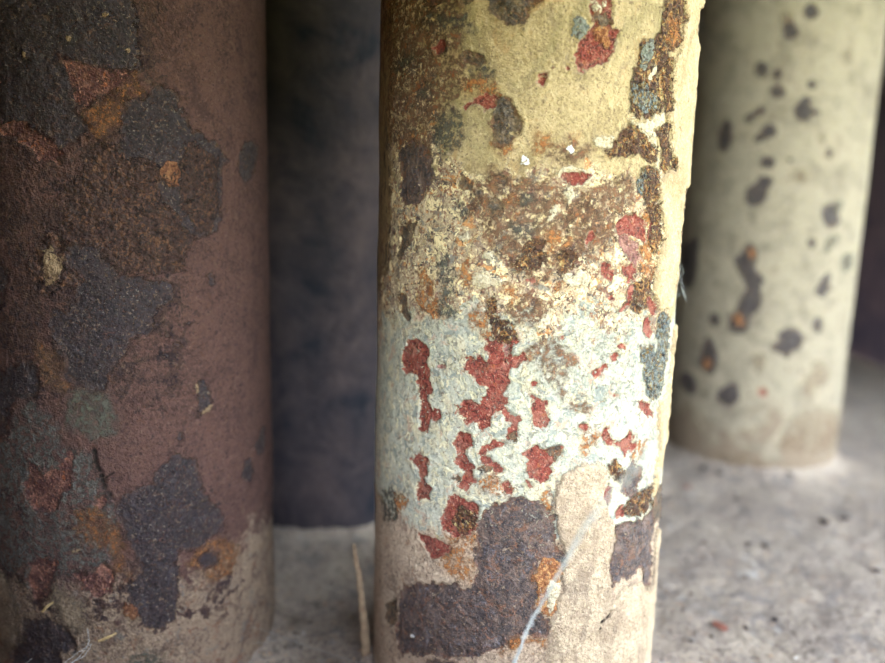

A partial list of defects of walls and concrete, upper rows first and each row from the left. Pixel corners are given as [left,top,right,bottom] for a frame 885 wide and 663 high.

peeling [535,0,620,87]
rust [0,0,229,393]
rust [398,138,437,205]
peeling [627,112,665,173]
rust [468,284,521,344]
rust [515,229,578,274]
peeling [600,212,660,312]
rust [698,244,764,375]
peeling [401,338,446,434]
peeling [418,337,551,559]
peeling [522,444,564,488]
rust [110,453,224,629]